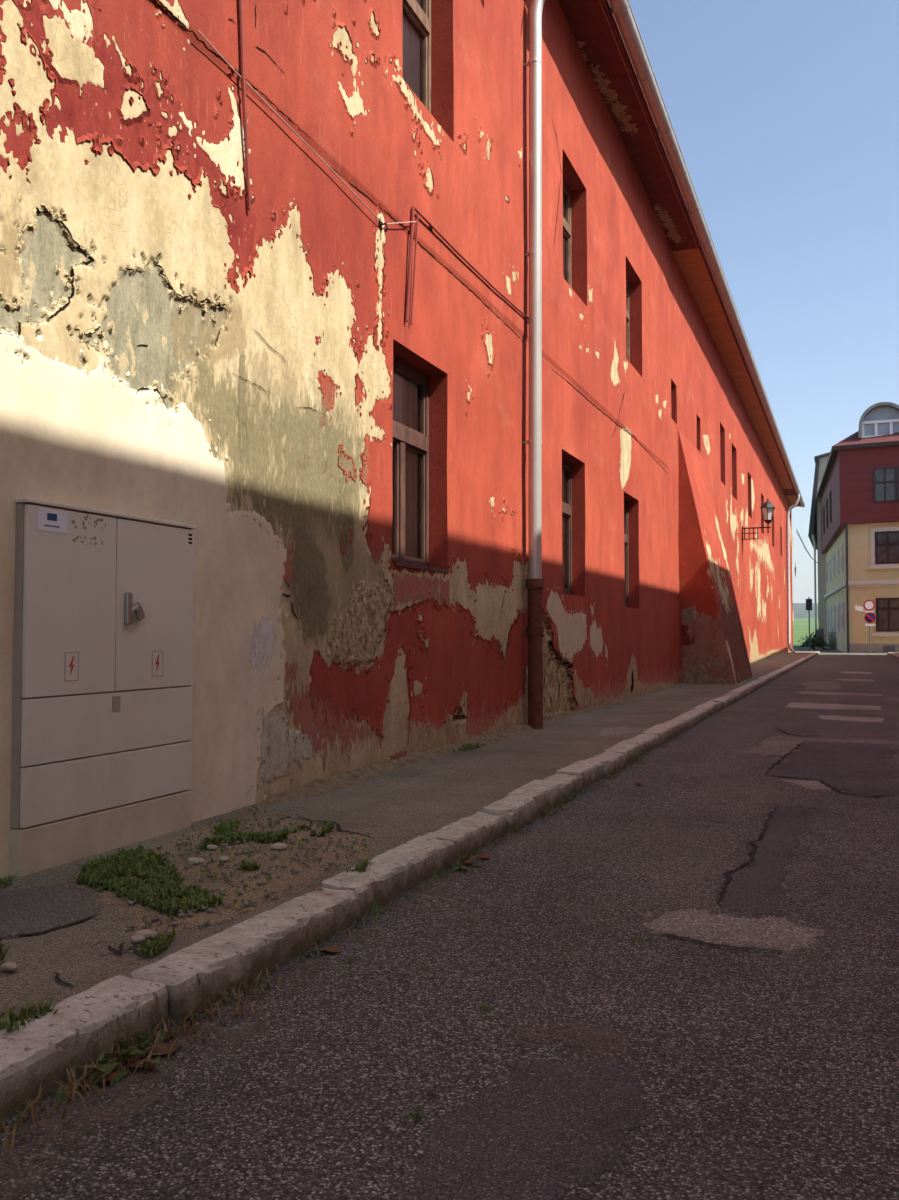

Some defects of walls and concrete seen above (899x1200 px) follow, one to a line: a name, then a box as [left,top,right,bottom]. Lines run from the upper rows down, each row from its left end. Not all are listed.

crack [17,207,95,334]
crack [124,257,267,392]
peeling [0,0,529,804]
crack [158,0,529,347]
crack [551,367,664,469]
flaking render [546,474,796,710]